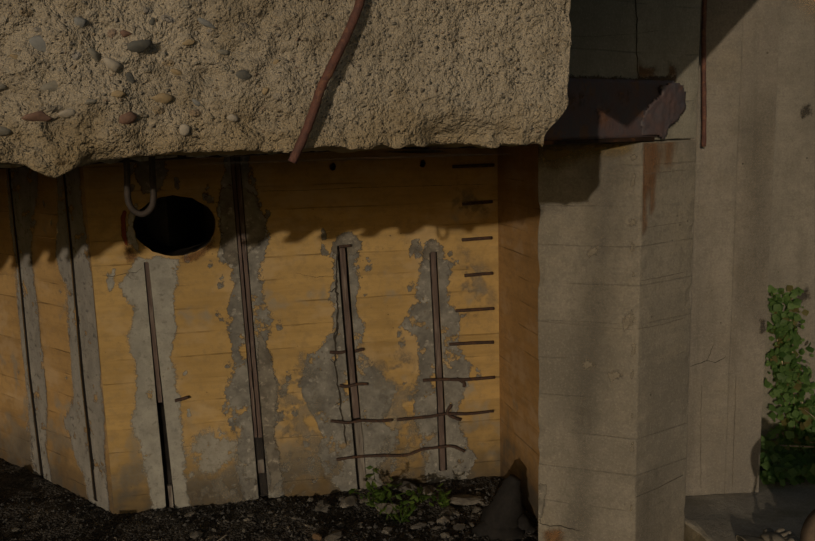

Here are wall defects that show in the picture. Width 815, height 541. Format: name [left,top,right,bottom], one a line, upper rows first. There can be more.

peeling [6,167,51,482]
peeling [50,167,110,512]
peeling [106,156,495,510]
rust [643,142,672,227]